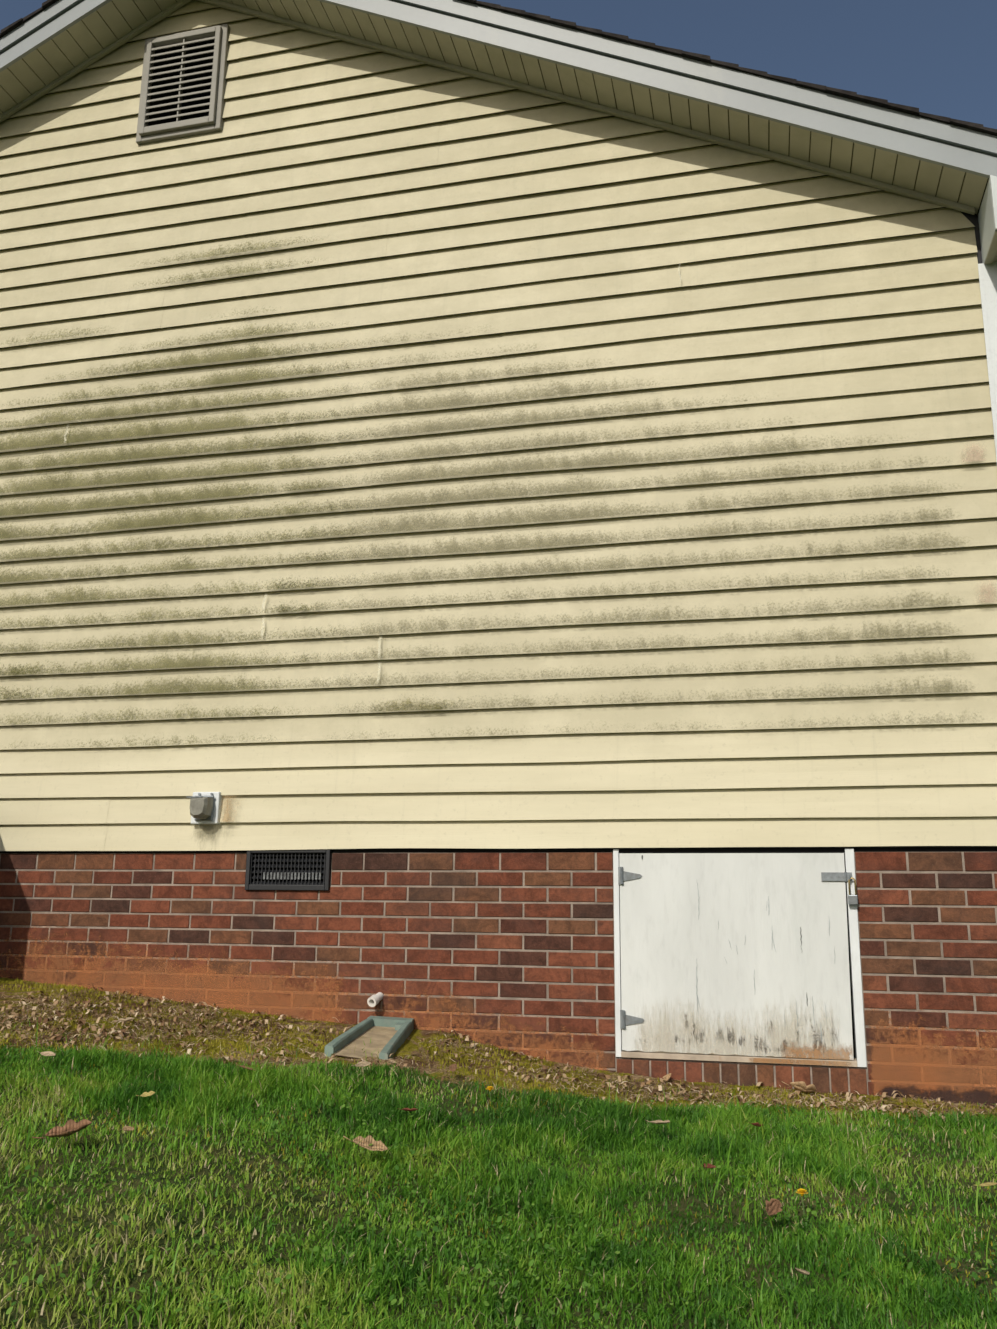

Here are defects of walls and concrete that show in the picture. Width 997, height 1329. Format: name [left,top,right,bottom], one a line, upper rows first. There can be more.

damp [0,309,962,724]